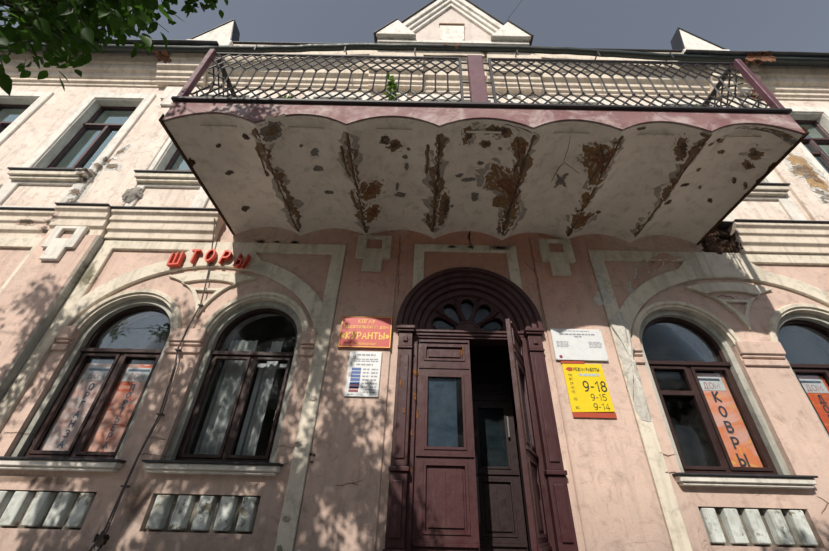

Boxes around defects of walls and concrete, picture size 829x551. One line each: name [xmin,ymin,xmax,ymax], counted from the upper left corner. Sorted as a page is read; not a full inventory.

peeling [242,114,304,232]
peeling [336,131,405,233]
spalling [372,131,411,170]
spalling [421,120,540,237]
peeling [554,173,569,188]
spalling [565,136,625,237]
spalling [732,126,829,204]
spalling [701,228,744,255]